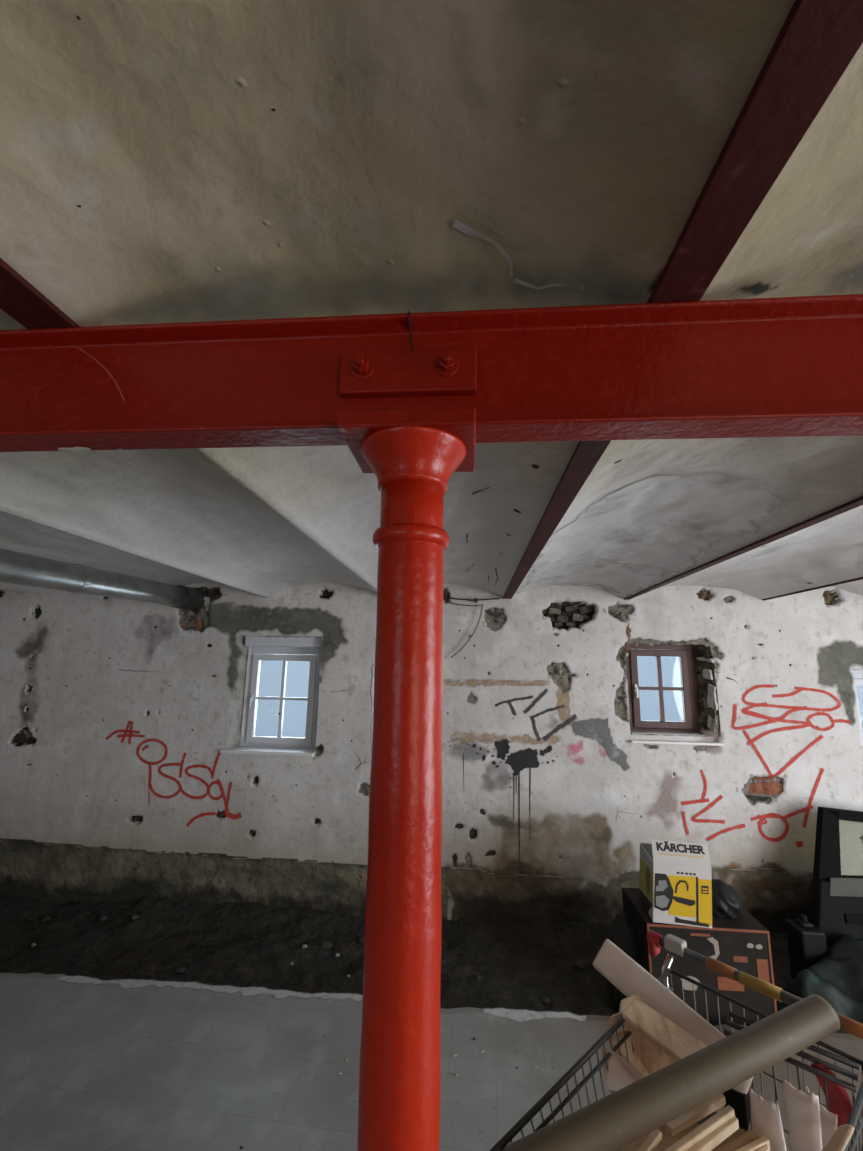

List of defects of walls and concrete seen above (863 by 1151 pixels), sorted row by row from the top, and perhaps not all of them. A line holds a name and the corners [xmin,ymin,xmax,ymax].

leakage [742,283,777,295]
spalling [177,584,227,647]
spalling [542,601,595,647]
flaking render [446,662,589,720]
flaking render [613,637,723,753]
flaking render [736,774,789,806]
leakage [478,814,622,897]